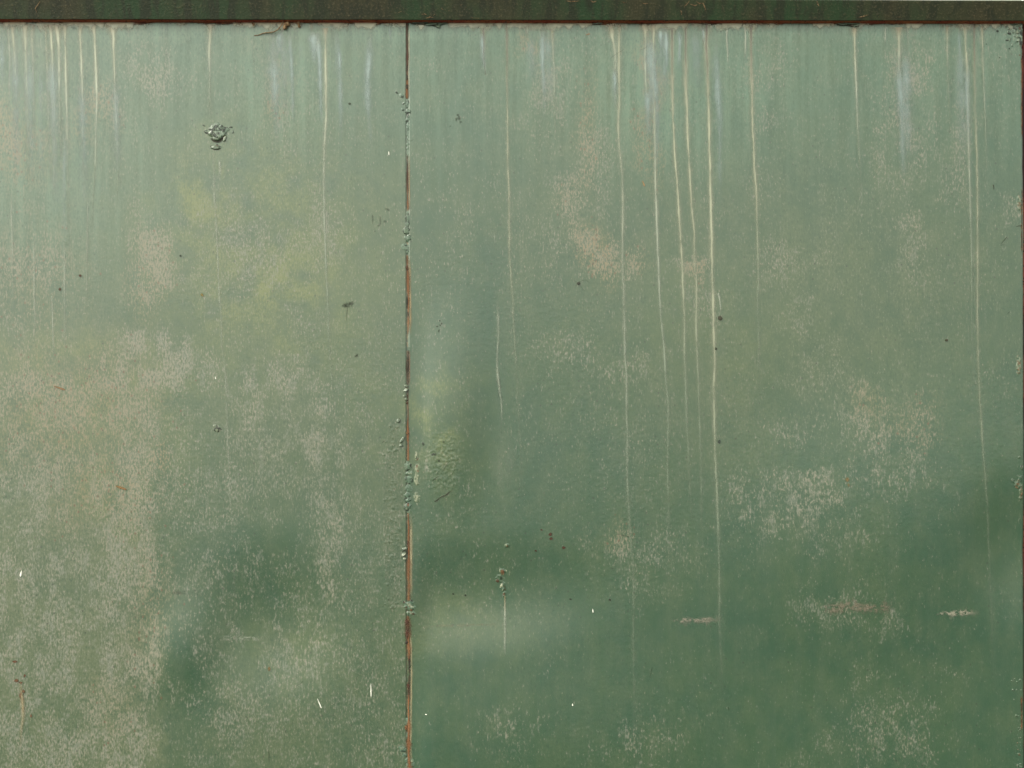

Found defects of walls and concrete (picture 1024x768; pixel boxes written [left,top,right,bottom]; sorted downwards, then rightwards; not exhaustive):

damp [0,22,146,185]
damp [448,23,593,94]
damp [608,23,626,259]
damp [642,23,775,523]
damp [885,24,923,117]
damp [946,24,1013,323]